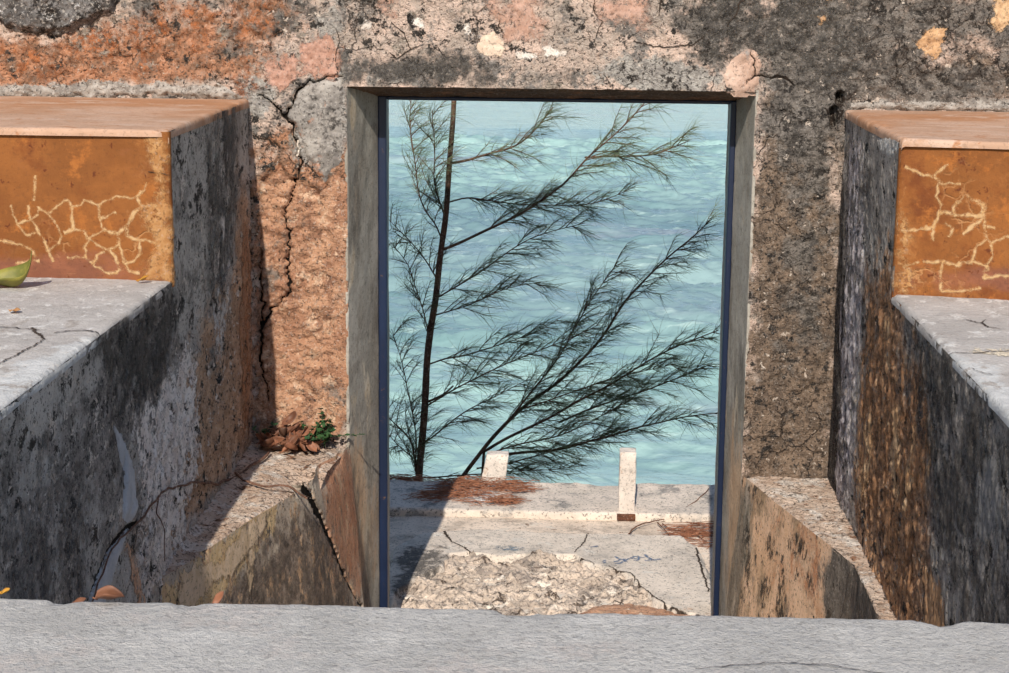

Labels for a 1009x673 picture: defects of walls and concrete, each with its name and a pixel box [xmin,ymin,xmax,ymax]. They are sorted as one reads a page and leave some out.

crack [746,52,794,85]
crack [0,171,166,274]
crack [252,31,343,399]
crack [901,164,1009,292]
crack [1,326,100,362]
crack [301,483,361,606]
crack [574,534,705,616]
crack [695,548,710,591]